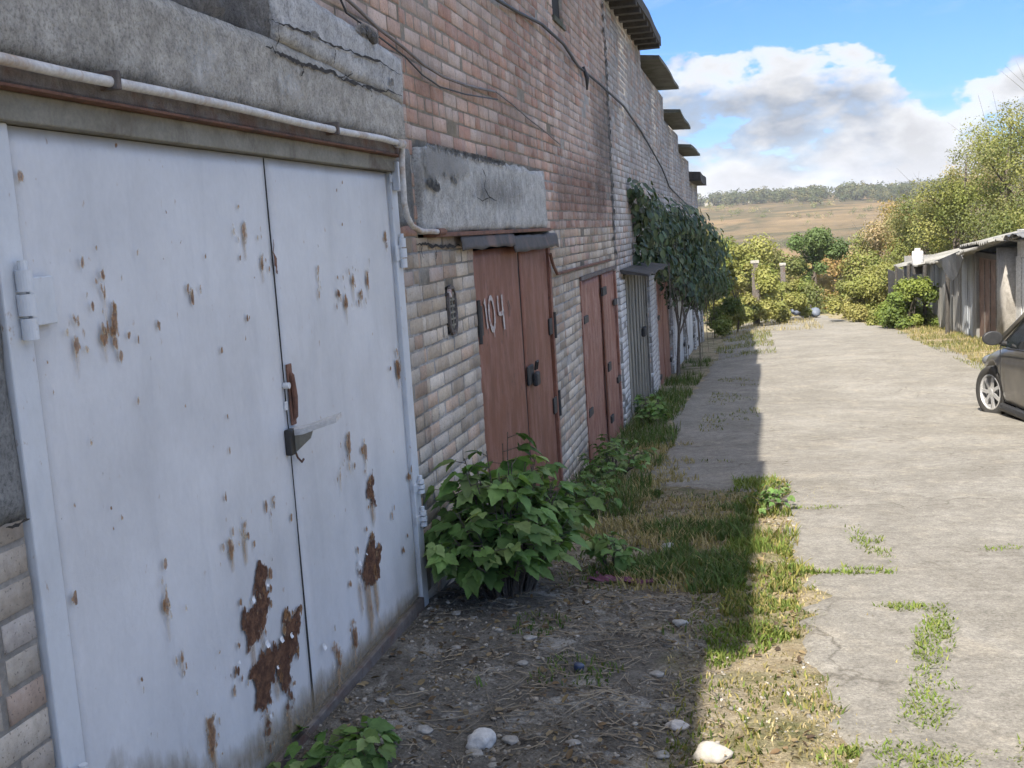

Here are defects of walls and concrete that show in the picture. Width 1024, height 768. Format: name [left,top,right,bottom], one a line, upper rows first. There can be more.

rust [233,223,278,278]
rust [66,316,89,356]
rust [86,270,139,363]
rust [336,269,369,309]
rust [337,431,382,629]
rust [162,558,172,618]
rust [222,523,302,753]
rust [206,714,223,768]